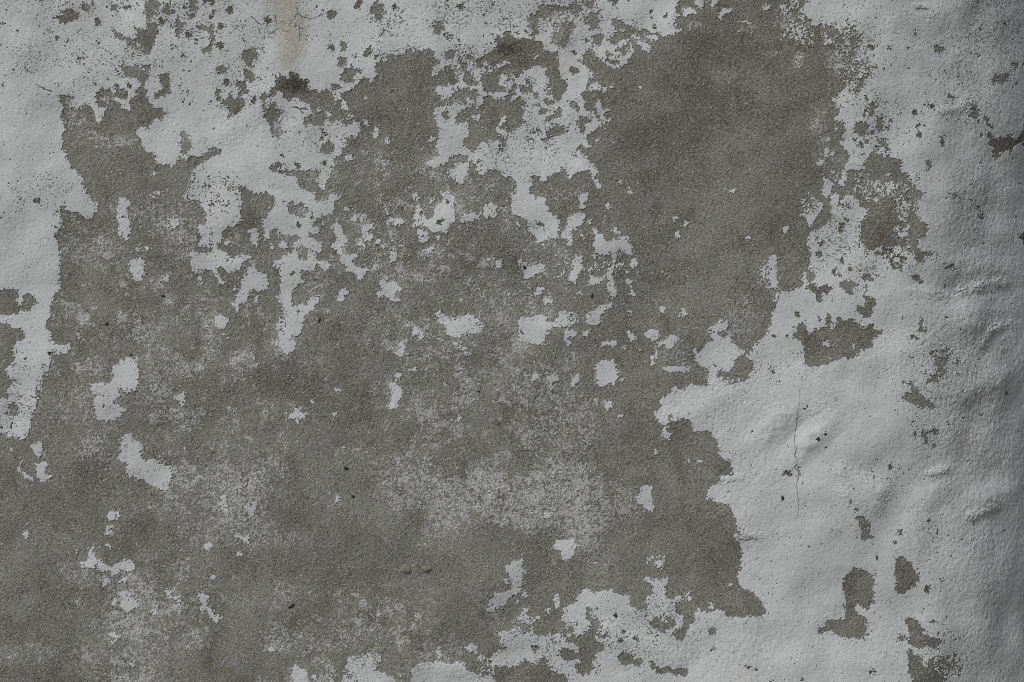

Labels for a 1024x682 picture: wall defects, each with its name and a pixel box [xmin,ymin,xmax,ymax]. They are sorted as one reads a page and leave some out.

peeling [0,0,94,79]
peeling [902,92,946,147]
peeling [0,167,63,219]
peeling [784,434,1018,682]